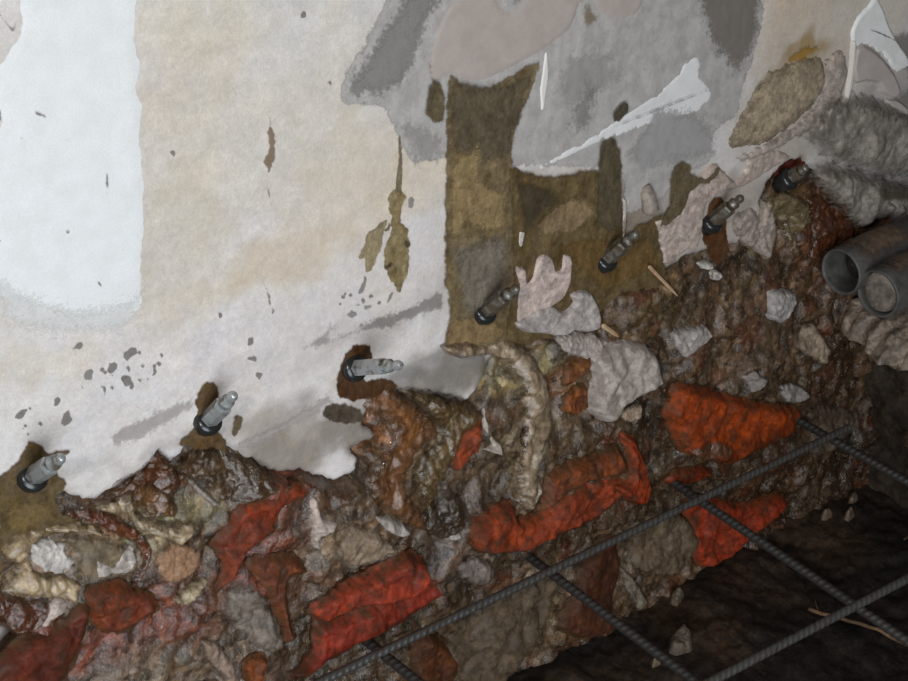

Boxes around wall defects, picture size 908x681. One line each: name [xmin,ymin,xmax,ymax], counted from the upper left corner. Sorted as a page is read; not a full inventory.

leakage [359,136,410,292]
leakage [426,63,719,347]
leakage [702,0,757,67]
flaking render [655,50,848,264]
spalling [782,168,895,238]
peeling [883,98,908,117]
spalling [0,213,908,681]